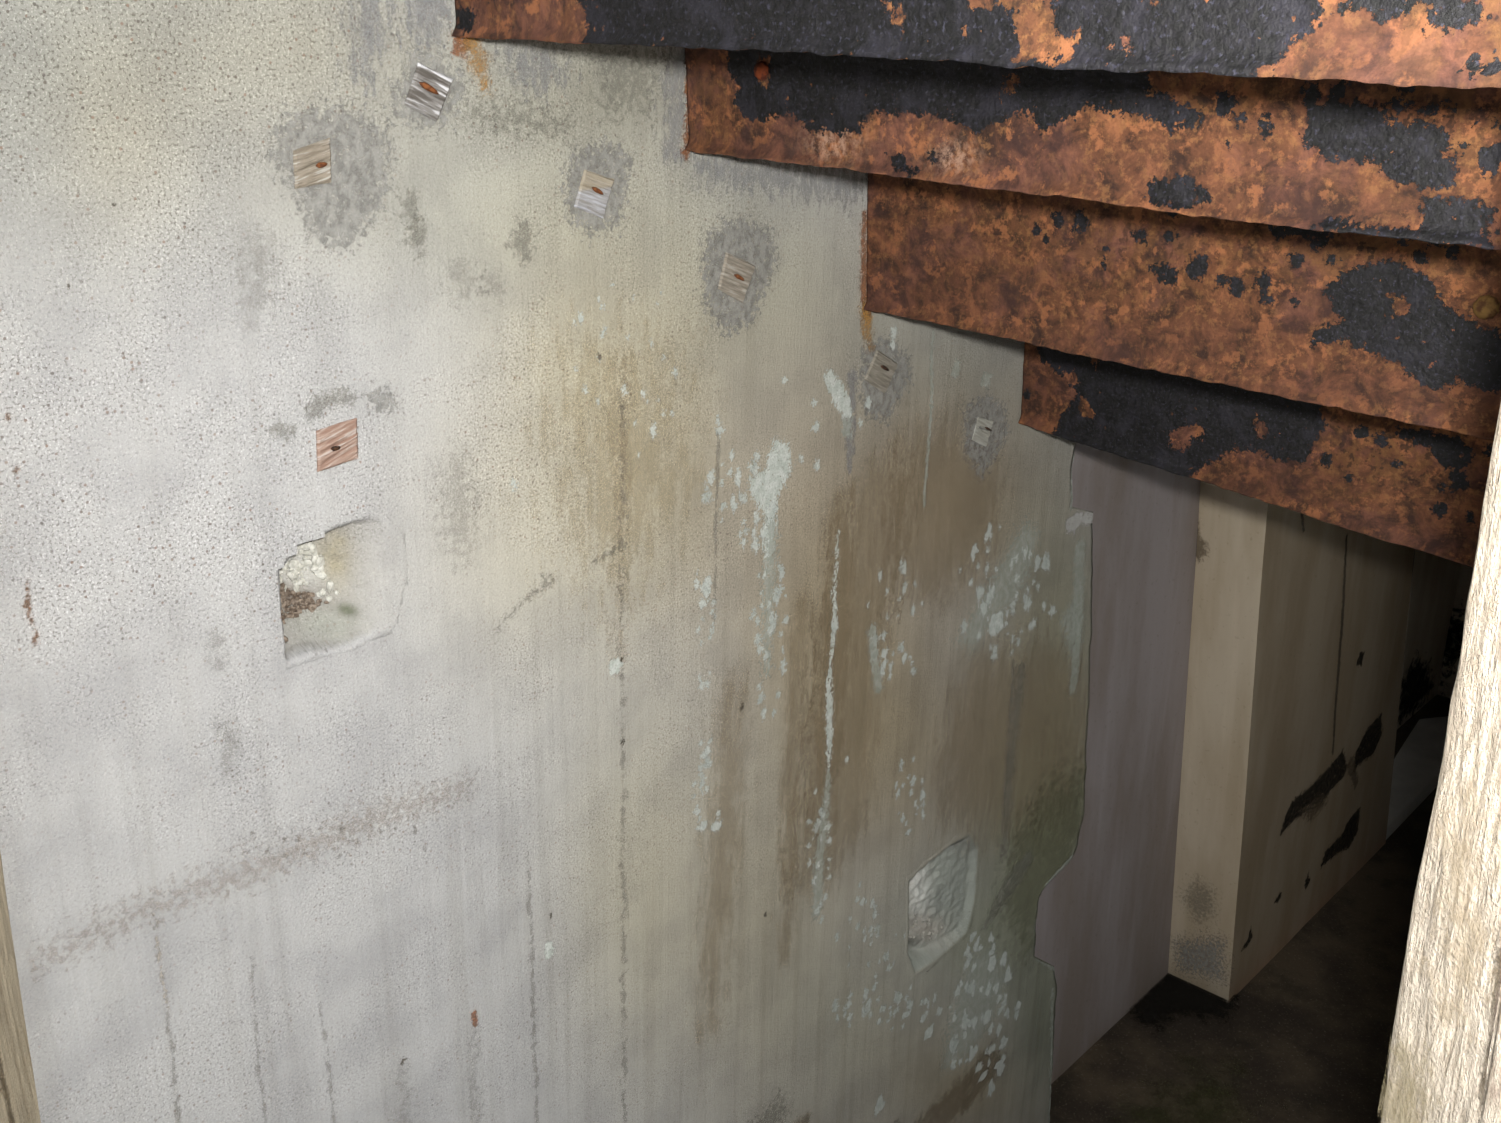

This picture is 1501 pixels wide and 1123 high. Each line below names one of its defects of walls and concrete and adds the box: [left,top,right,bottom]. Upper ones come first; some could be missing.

corrosion [451,35,492,91]
corrosion [860,210,872,350]
damp [810,325,914,433]
spalling [277,512,408,670]
damp [701,414,821,721]
damp [824,530,849,773]
damp [867,556,924,681]
damp [958,522,1057,664]
damp [1398,599,1465,725]
damp [690,735,722,833]
damp [806,789,1022,1097]
spalling [904,830,982,980]